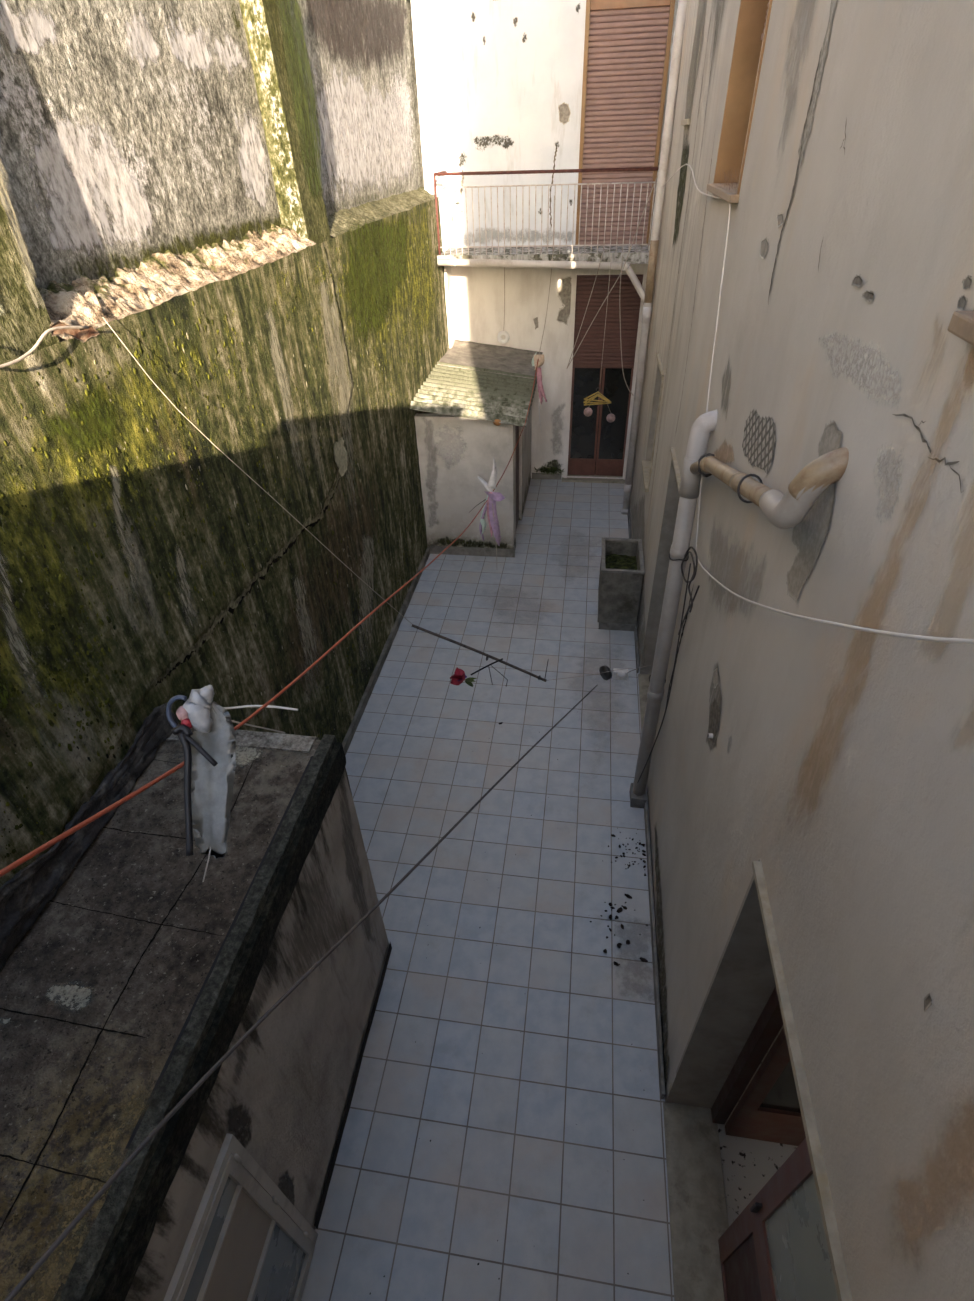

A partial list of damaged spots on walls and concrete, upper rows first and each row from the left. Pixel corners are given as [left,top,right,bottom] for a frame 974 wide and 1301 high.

water stain [0,164,44,308]
water stain [30,118,152,252]
crack [768,0,838,305]
water stain [269,310,302,481]
water stain [320,284,356,501]
crack [892,414,963,493]
water stain [0,553,34,687]
water stain [110,467,137,588]
water stain [177,549,196,627]
water stain [294,577,318,679]
spalling [708,667,720,744]
water stain [227,1105,251,1148]